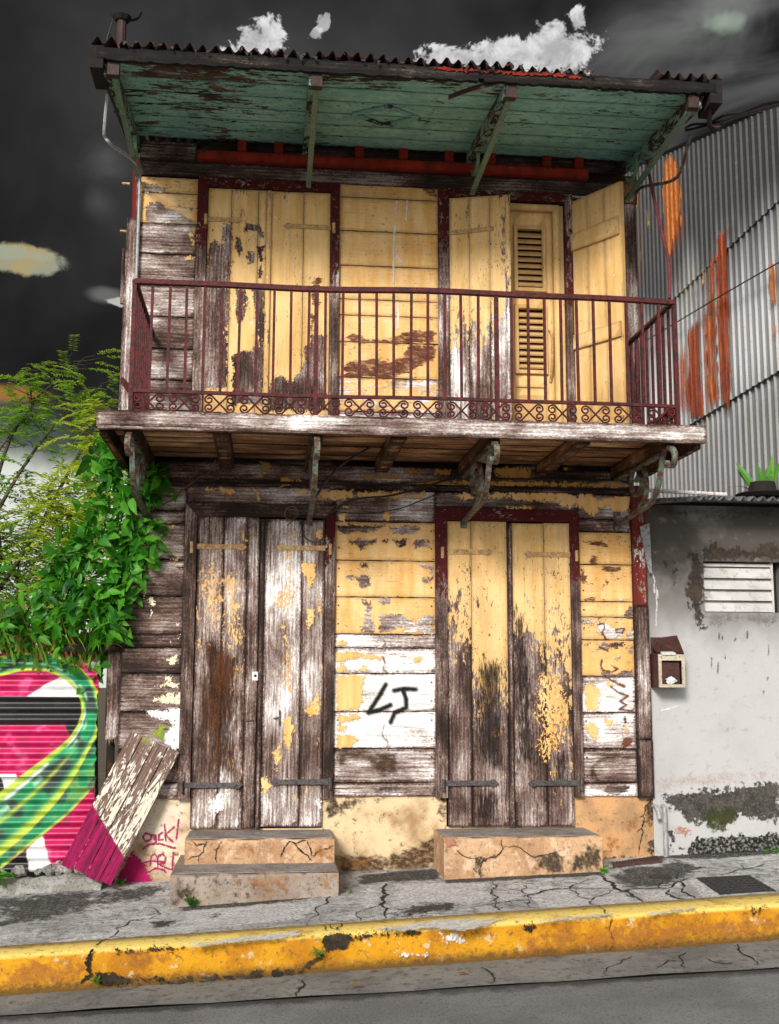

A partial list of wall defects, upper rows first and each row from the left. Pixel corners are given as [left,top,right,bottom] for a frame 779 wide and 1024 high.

corrosion [647,153,683,258]
peeling [145,182,328,412]
corrosion [677,232,732,422]
peeling [280,465,631,641]
damp [475,605,538,769]
peeling [530,673,572,780]
crack [80,907,161,984]
peeling [92,901,507,988]
crack [280,840,333,860]
damp [326,797,356,817]
damp [341,838,434,871]
crack [457,840,778,972]